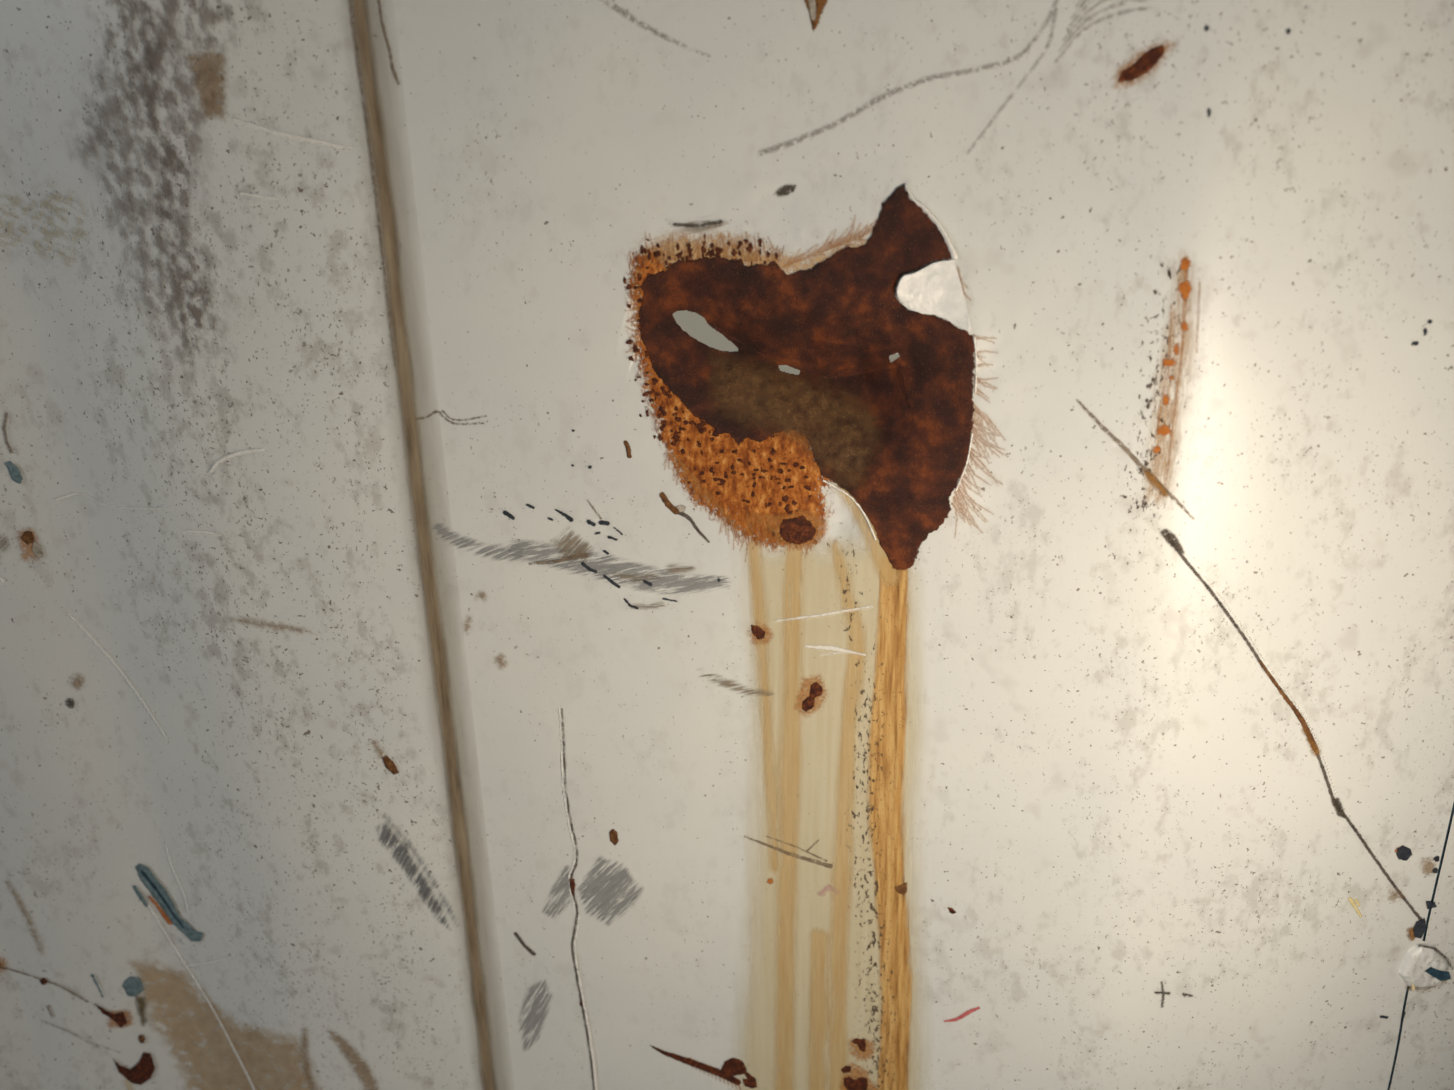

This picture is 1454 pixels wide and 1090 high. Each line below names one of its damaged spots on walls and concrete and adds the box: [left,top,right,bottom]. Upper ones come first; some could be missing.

rust [1118,45,1168,84]
rust [1120,258,1192,532]
rust [623,234,914,1090]
crack [558,709,598,1090]